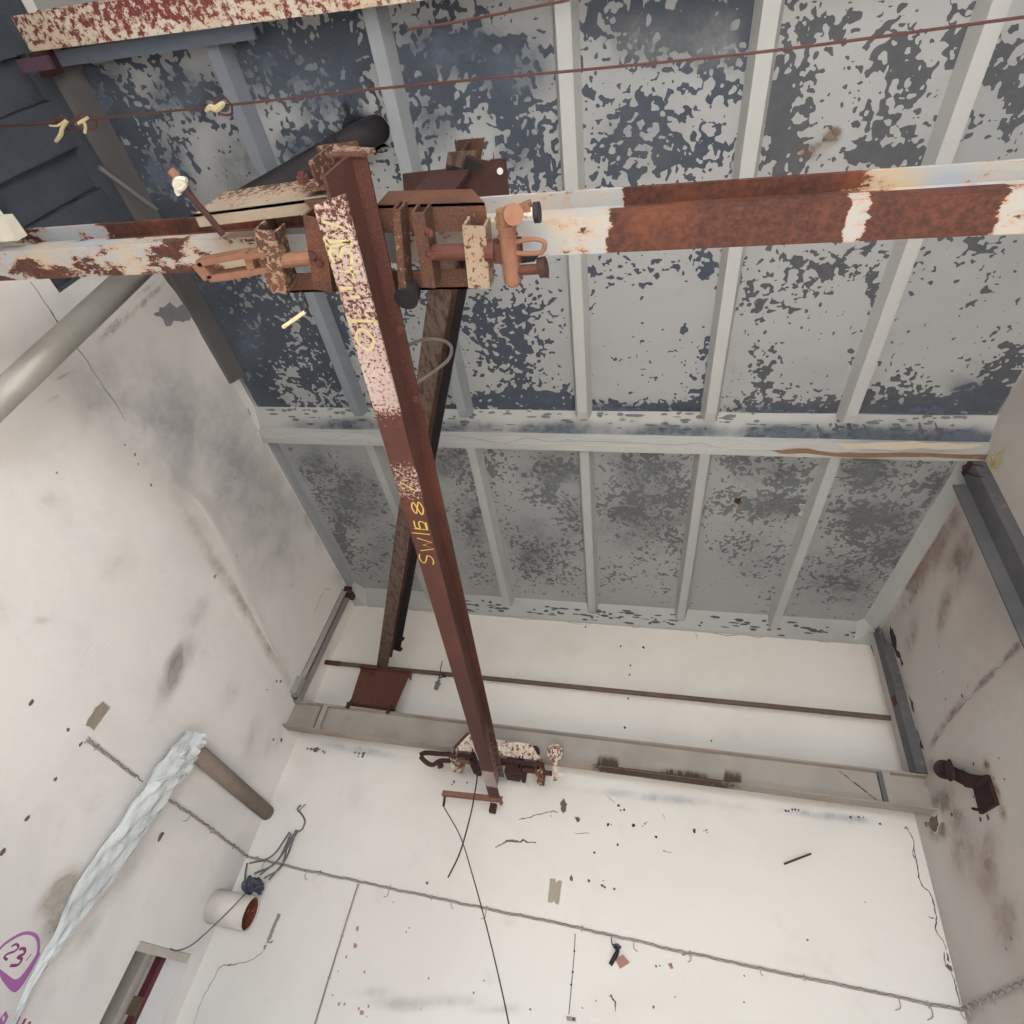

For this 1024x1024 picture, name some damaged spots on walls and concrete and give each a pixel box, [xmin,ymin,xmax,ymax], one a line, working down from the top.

peeling [79,49,251,219]
peeling [233,9,390,164]
peeling [368,141,402,197]
peeling [388,0,562,194]
peeling [579,0,755,189]
peeling [758,0,976,176]
peeling [960,24,1024,160]
flaking render [154,273,200,332]
peeling [207,274,378,425]
peeling [437,235,1024,636]
leakage [167,653,183,688]
crack [495,810,557,848]